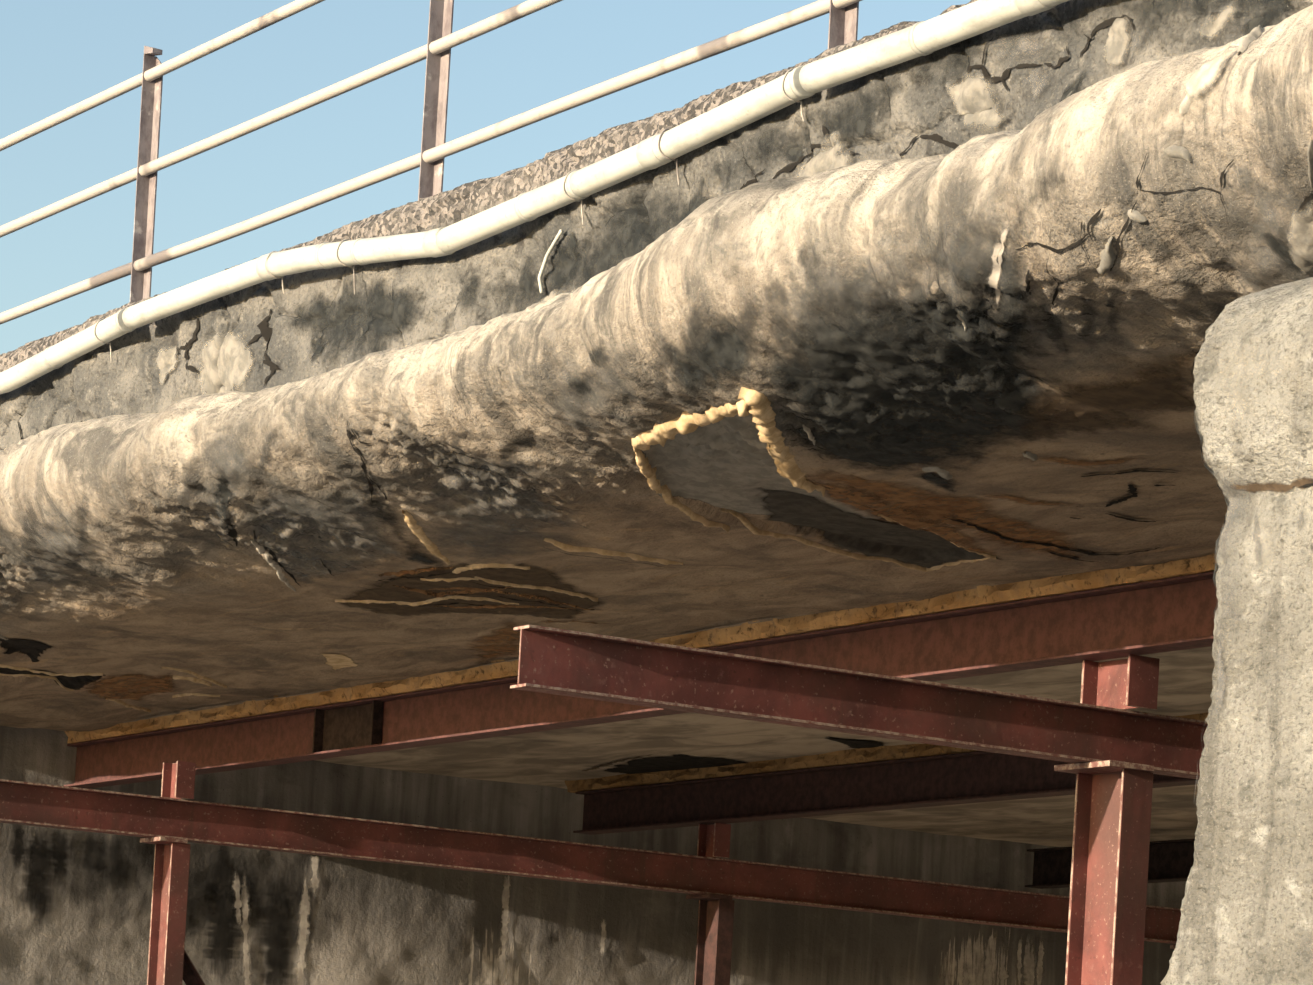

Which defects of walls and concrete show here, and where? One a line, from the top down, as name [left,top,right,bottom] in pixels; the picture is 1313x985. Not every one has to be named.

crack [950,15,1135,92]
crack [740,125,861,190]
crack [899,134,958,159]
crack [1080,154,1233,271]
water stain [653,306,755,393]
water stain [766,196,1247,615]
spalling [631,387,1000,572]
crack [1234,477,1313,493]
peeling [224,496,603,619]
spalling [0,635,212,701]
water stain [10,826,67,919]
water stain [187,845,320,985]